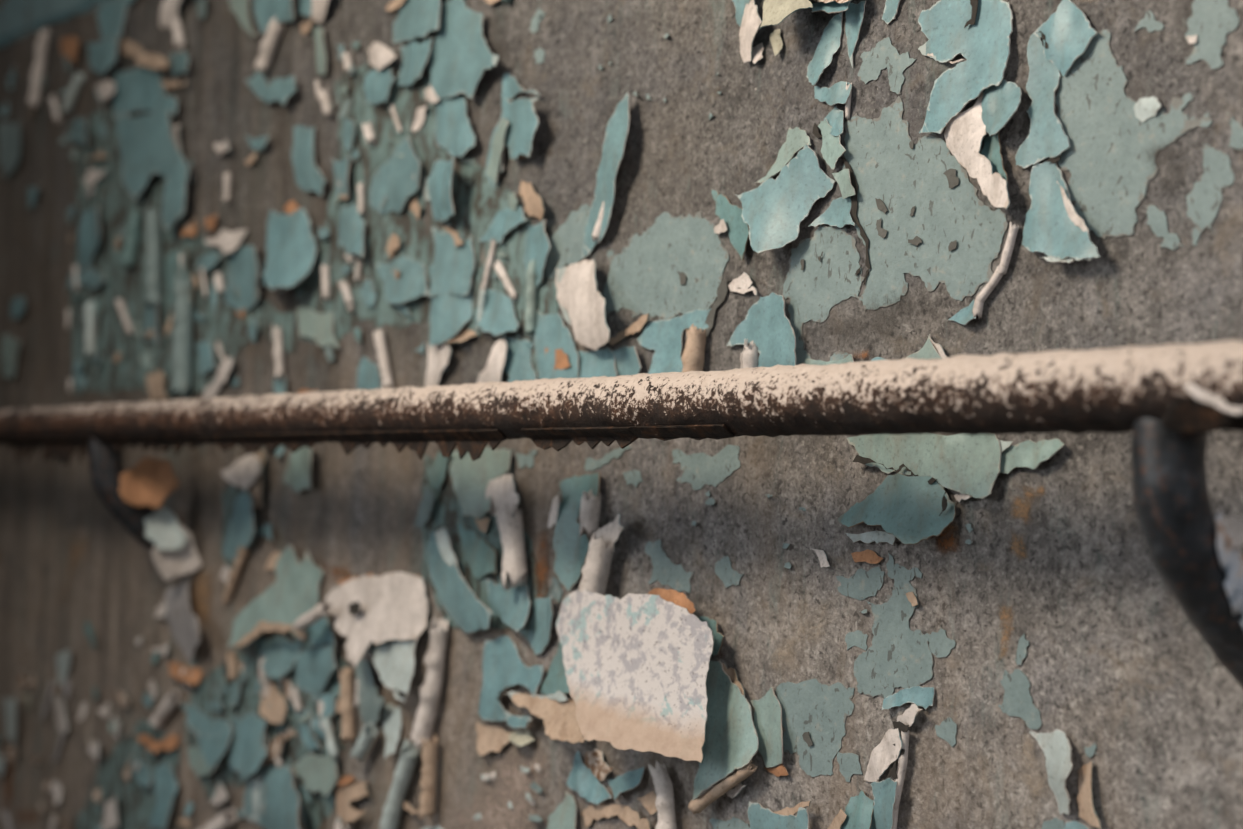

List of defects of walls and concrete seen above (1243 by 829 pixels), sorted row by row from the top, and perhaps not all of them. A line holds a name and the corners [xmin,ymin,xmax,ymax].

peeling [882,0,901,25]
peeling [0,0,711,401]
peeling [712,0,866,369]
peeling [918,0,1100,325]
peeling [1134,97,1161,122]
peeling [906,334,948,359]
peeling [0,446,811,829]
peeling [812,549,830,568]
peeling [906,592,919,607]
peeling [837,433,1065,564]
peeling [827,686,935,829]
peeling [1030,729,1102,829]